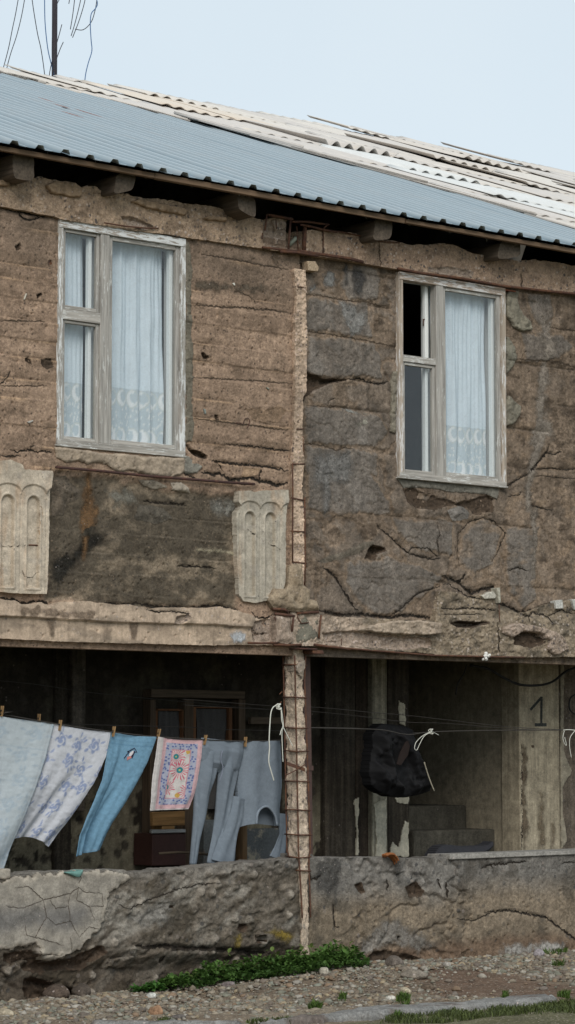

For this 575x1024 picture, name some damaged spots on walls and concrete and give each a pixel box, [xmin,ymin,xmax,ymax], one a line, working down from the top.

crack [2,445,52,457]
spalling [397,478,499,515]
damp [52,534,103,583]
spalling [365,545,387,560]
crack [319,517,572,652]
spalling [247,605,572,918]
crack [6,876,220,950]
crack [437,879,575,940]